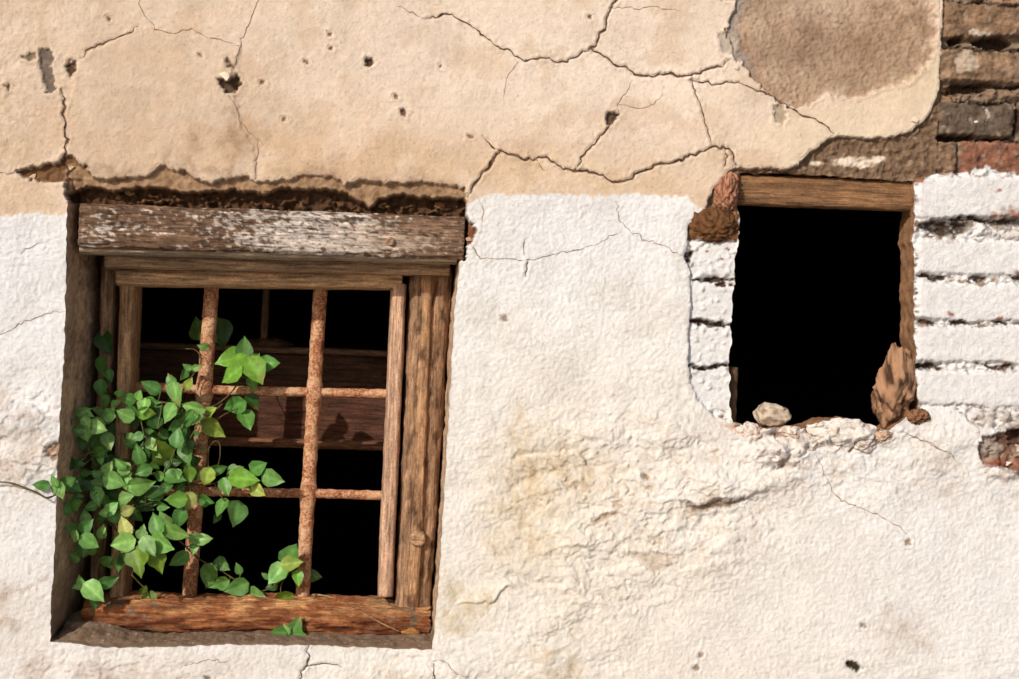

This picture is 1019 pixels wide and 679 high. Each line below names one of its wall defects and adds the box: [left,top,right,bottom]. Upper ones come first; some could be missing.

crack [83,0,258,68]
spalling [722,0,1019,184]
crack [61,90,79,202]
crack [398,0,832,277]
spalling [14,152,471,221]
spalling [713,171,739,211]
spalling [977,427,1019,477]
crack [816,456,909,536]
crack [300,646,338,679]